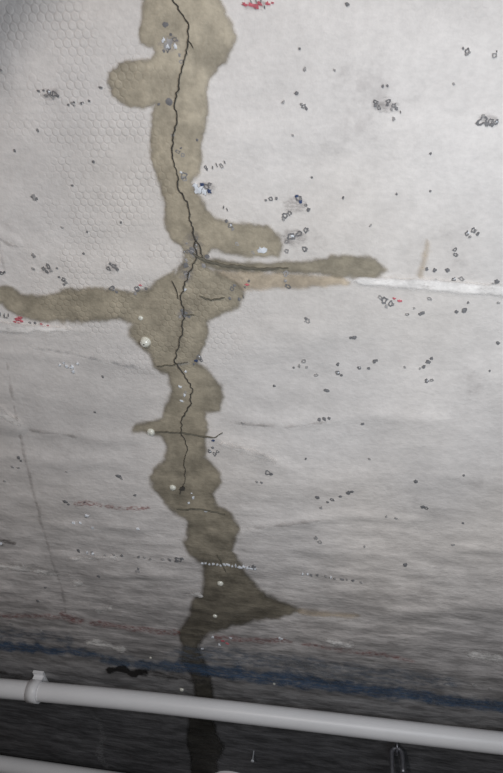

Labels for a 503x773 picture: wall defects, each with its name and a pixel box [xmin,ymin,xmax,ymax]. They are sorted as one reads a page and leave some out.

damp [0,0,386,698]
crack [154,0,289,514]
damp [187,718,224,773]